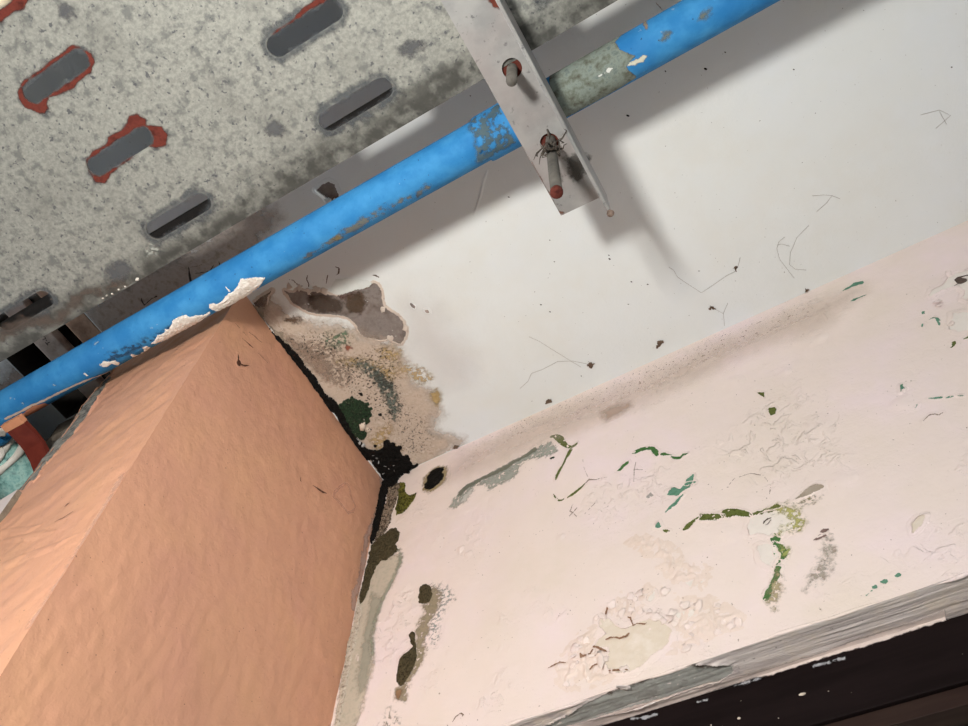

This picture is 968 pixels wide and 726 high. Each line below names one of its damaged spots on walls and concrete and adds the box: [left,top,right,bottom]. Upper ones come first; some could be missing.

flaking render [252,278,432,346]
peeling [918,267,968,350]
damp [259,299,462,544]
damp [335,549,402,726]
peeling [534,519,747,726]
peeling [742,480,828,609]